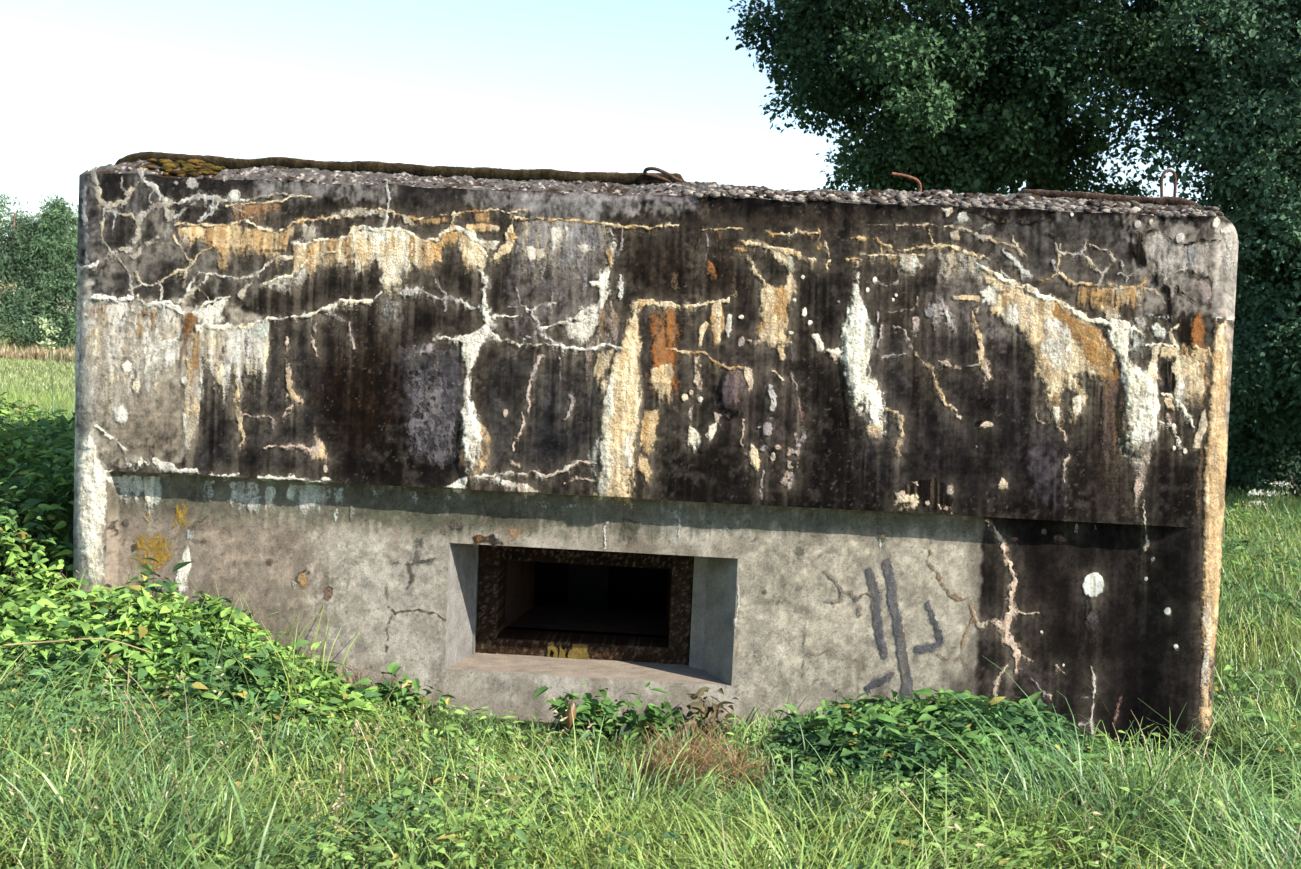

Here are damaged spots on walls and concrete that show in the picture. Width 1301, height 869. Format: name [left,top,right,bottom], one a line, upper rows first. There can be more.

damp [75,294,355,582]
crack [77,166,623,499]
damp [260,214,659,549]
rust [630,276,737,403]
damp [682,240,816,499]
damp [812,261,886,438]
crack [876,270,991,419]
crack [880,201,1139,288]
damp [903,232,1236,733]
rust [1041,272,1214,403]
peeling [1127,211,1232,309]
crack [927,520,1122,735]